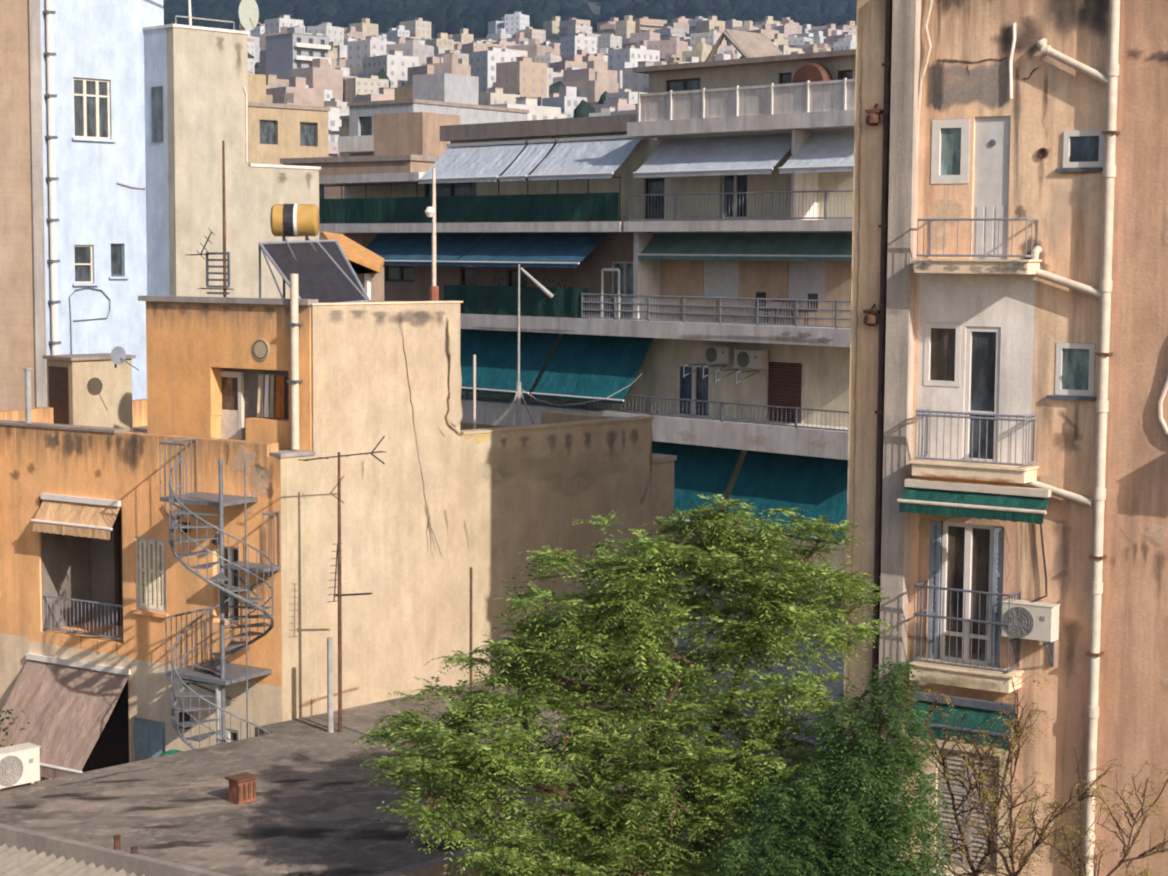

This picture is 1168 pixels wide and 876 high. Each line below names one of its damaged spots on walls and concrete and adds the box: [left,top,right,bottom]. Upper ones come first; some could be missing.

crack [402,333,441,553]
crack [445,322,459,434]